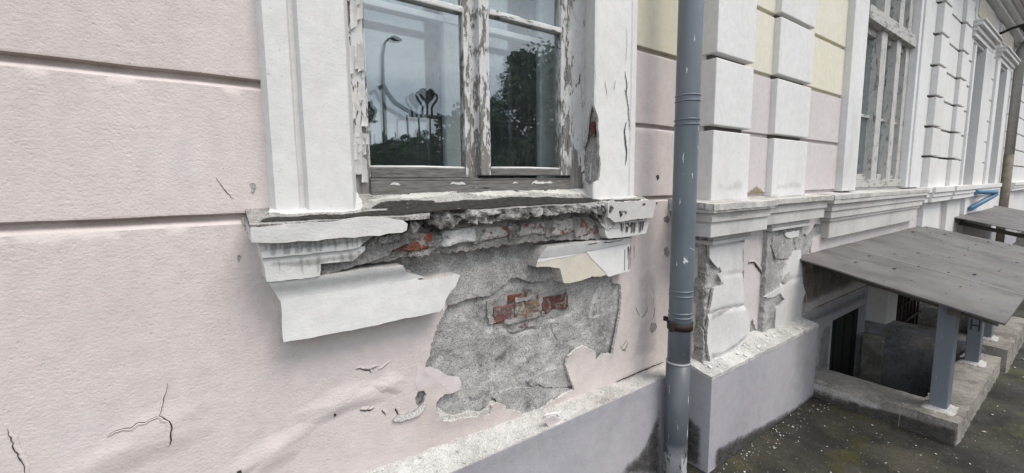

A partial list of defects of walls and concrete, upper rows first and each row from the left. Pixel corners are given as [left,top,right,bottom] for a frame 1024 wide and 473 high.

peeling [348,0,369,183]
spalling [320,107,627,422]
spalling [664,236,724,364]
spalling [750,224,820,332]
crack [7,428,31,473]
crack [107,384,173,446]